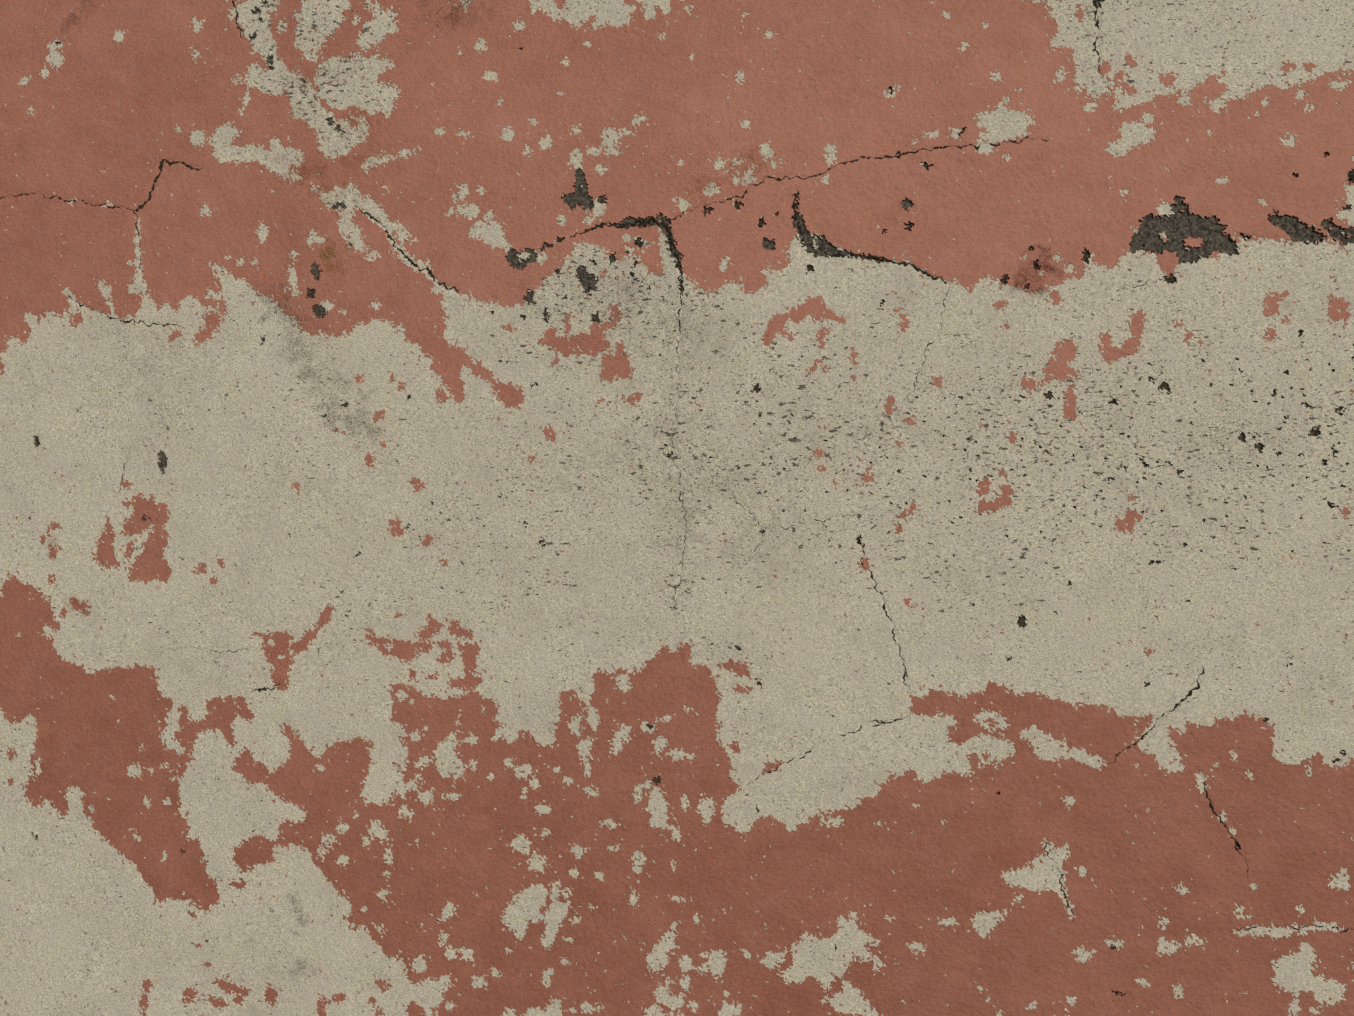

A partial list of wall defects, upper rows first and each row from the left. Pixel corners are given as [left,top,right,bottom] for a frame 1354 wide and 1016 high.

peeling [457,0,699,107]
peeling [911,67,1036,172]
crack [1093,0,1103,75]
peeling [1021,0,1354,158]
crack [0,159,203,276]
peeling [255,220,277,244]
crack [354,205,459,291]
spalling [876,192,916,234]
crack [65,291,178,327]
crack [732,491,910,784]
crack [1109,668,1205,764]
peeling [1211,810,1240,850]